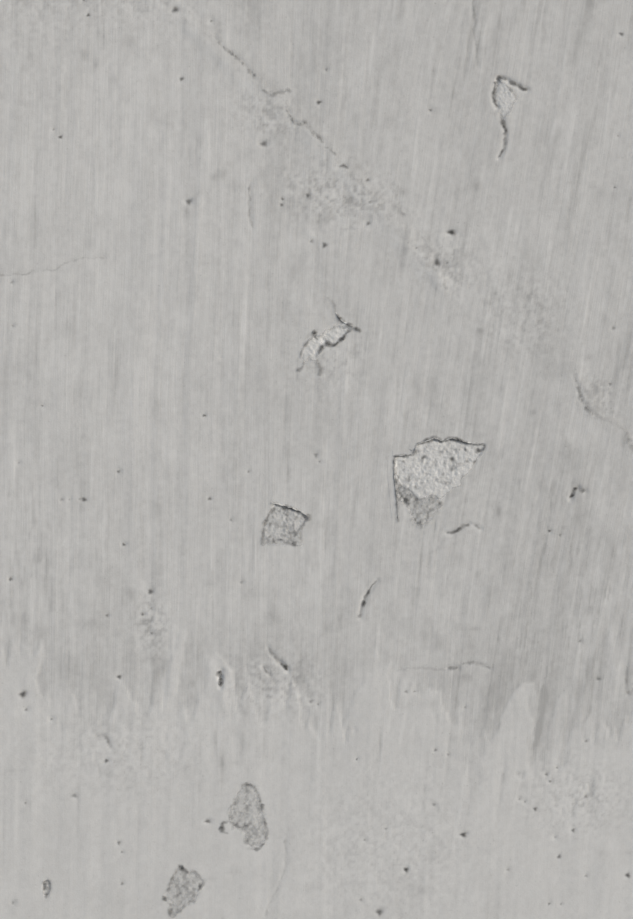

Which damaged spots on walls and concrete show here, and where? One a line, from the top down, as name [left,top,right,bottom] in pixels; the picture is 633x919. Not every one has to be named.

spalling [302,310,360,362]
spalling [387,432,485,525]
spalling [262,496,311,546]